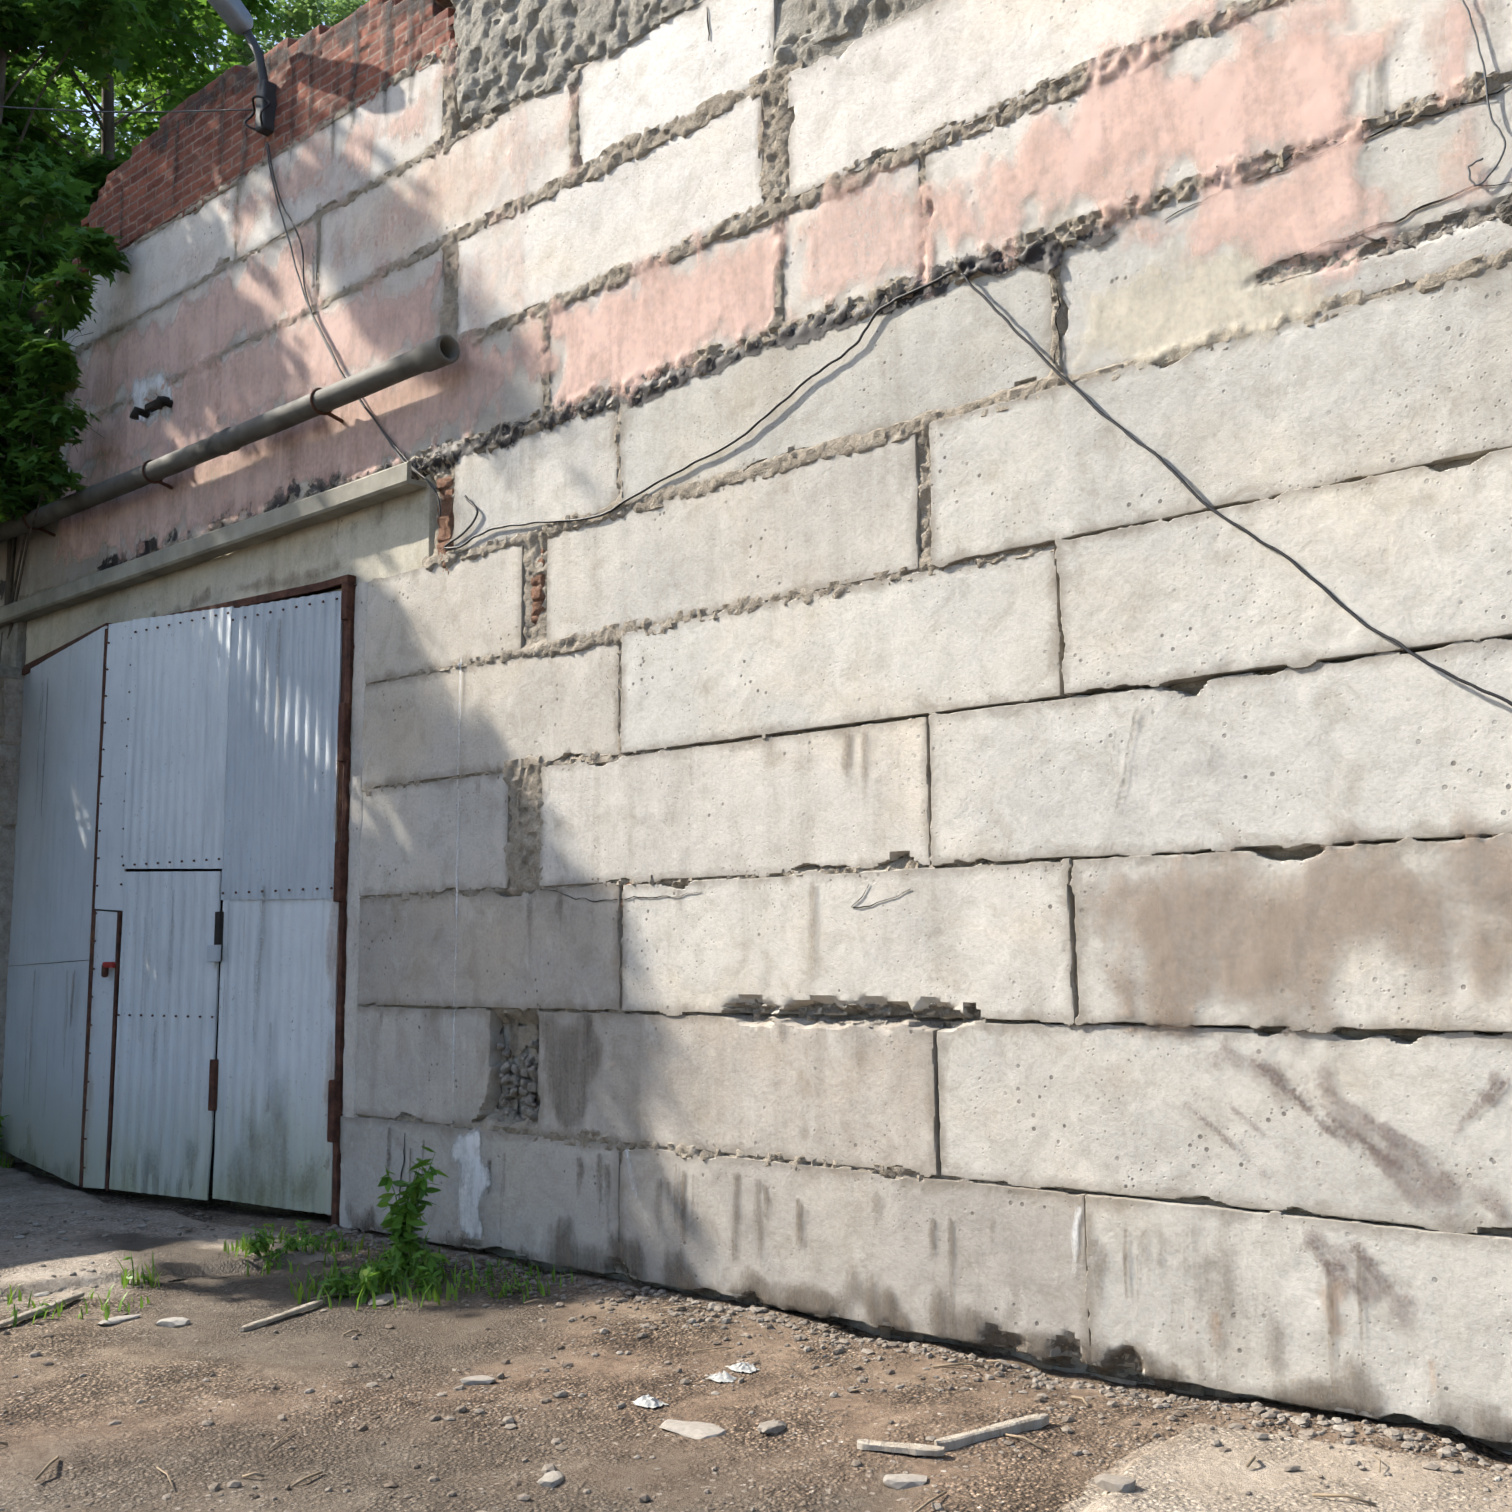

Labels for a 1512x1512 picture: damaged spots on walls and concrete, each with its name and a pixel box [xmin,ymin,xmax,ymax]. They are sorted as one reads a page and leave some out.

peeling [346,100,423,166]
peeling [57,140,441,500]
peeling [56,225,782,562]
leakage [97,224,1120,571]
spalling [722,999,976,1029]
leakage [453,1131,491,1238]
leakage [1072,1208,1080,1253]